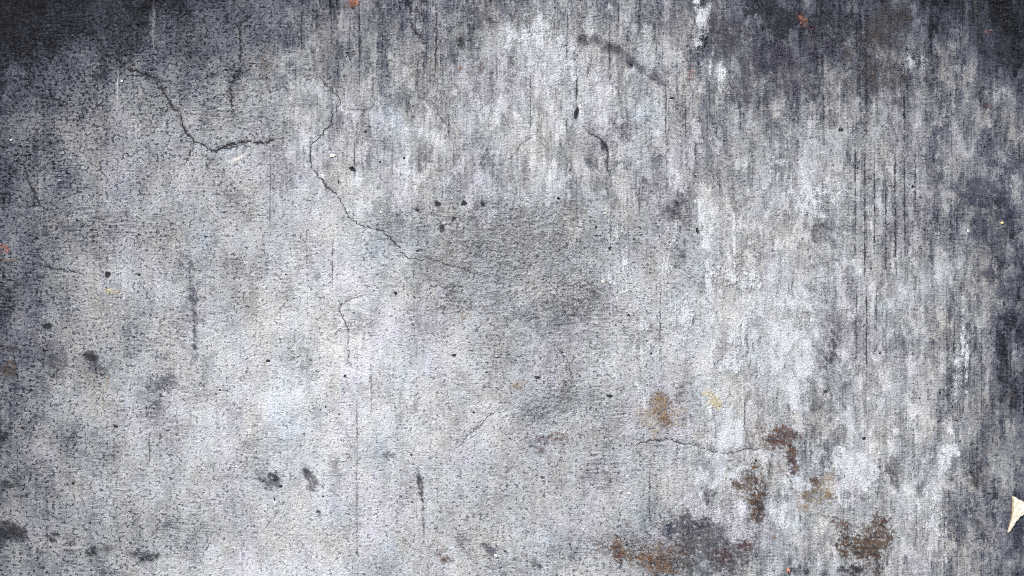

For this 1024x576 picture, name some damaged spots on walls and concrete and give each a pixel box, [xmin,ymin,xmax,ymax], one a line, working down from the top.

leakage [704,0,857,106]
crack [128,68,274,162]
crack [310,79,476,274]
leakage [731,212,758,288]
leakage [810,178,841,267]
leakage [927,160,1017,282]
leakage [954,293,970,396]
corrosion [649,387,684,430]
crack [637,437,758,454]
corrosion [730,423,842,523]
corrosion [595,522,693,576]
corrosion [825,512,895,574]